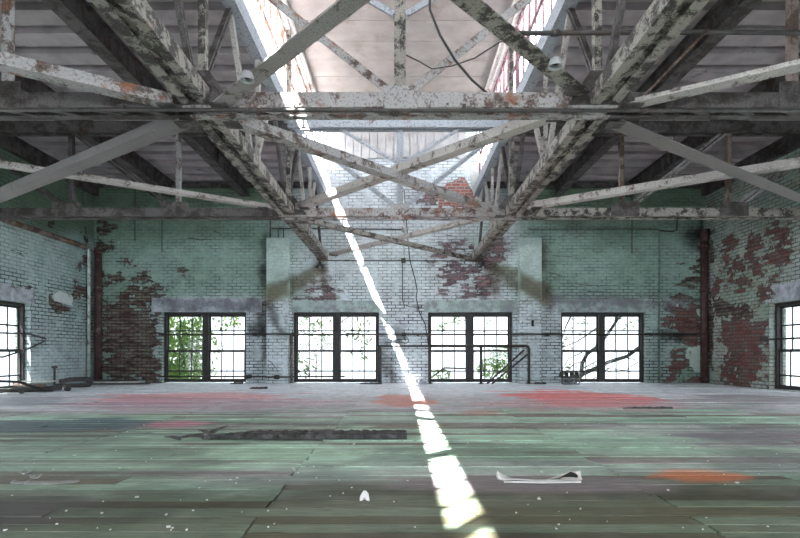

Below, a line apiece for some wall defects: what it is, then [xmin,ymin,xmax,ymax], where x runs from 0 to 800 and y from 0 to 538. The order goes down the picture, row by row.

spalling [406,177,475,208]
peeling [49,220,120,314]
peeling [91,258,173,383]
peeling [427,235,510,298]
peeling [660,220,795,389]